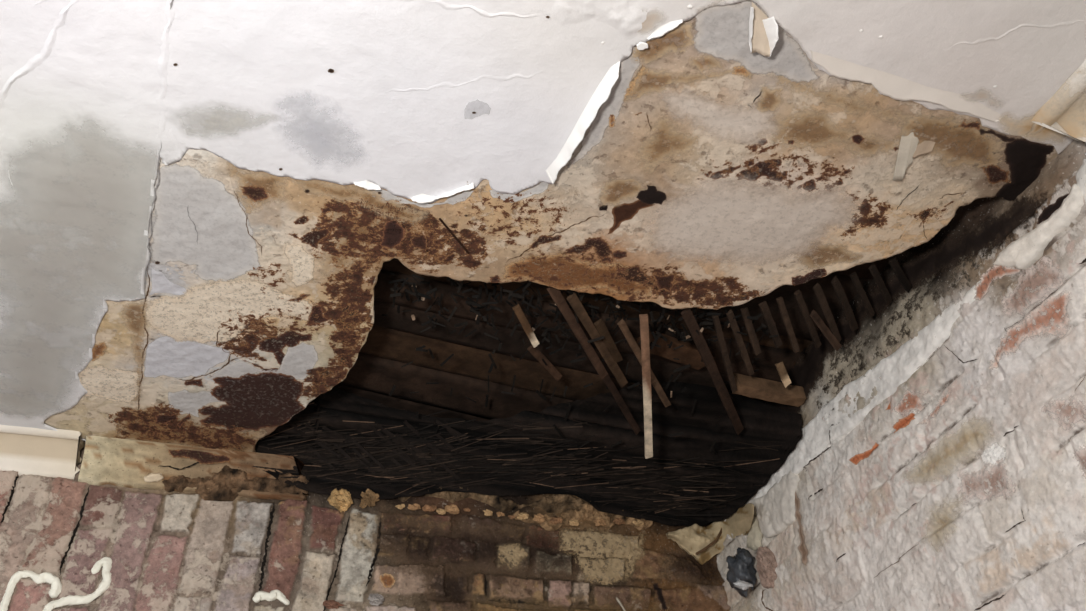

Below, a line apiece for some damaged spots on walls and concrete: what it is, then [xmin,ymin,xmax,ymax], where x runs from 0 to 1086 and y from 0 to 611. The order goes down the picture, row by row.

damp [0,122,265,452]
damp [229,163,427,276]
flaking render [44,0,1058,452]
damp [797,241,862,268]
mould [817,242,1001,419]
flaking render [144,473,164,482]
flaking render [746,470,800,551]
crack [803,424,833,499]
spalling [849,443,879,465]
damp [906,419,990,482]
crack [975,595,1004,610]